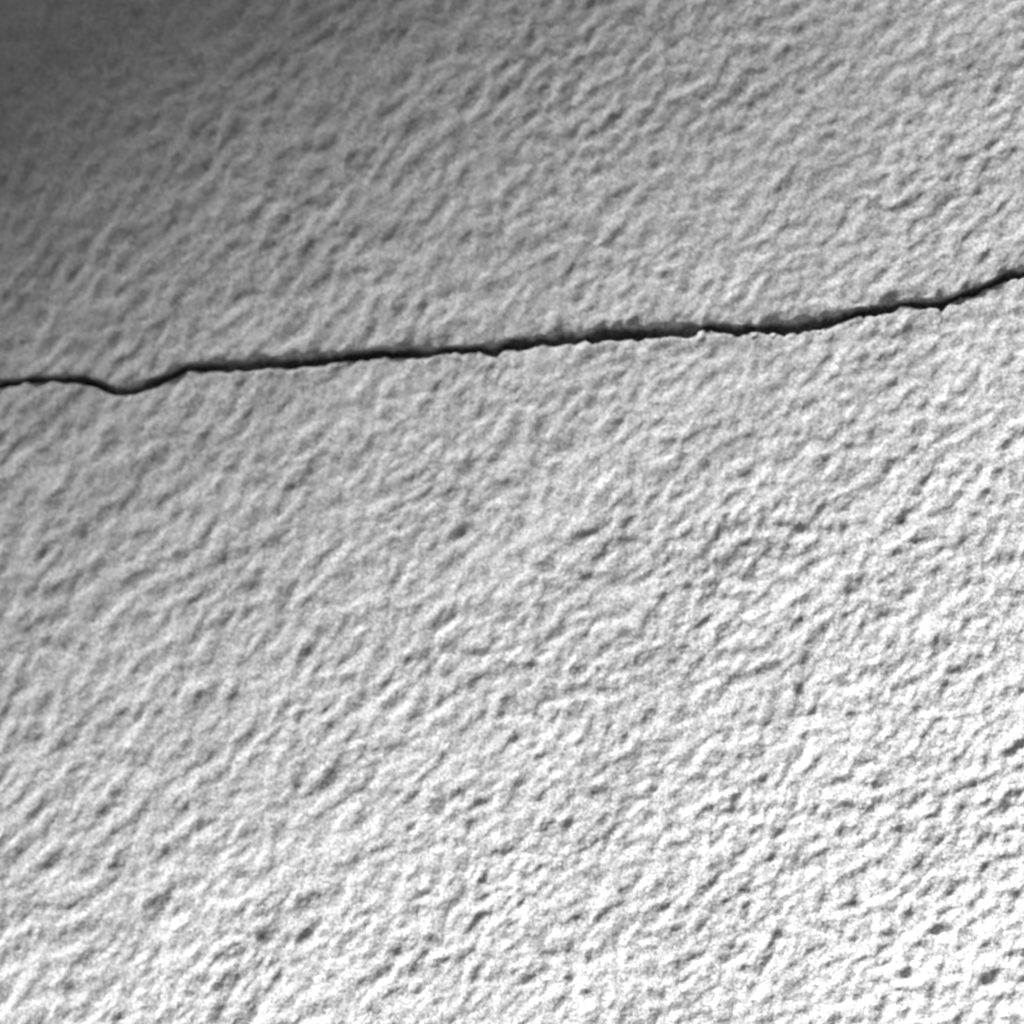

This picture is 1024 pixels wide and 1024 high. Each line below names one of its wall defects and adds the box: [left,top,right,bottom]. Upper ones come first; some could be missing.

crack [0,271,1024,396]